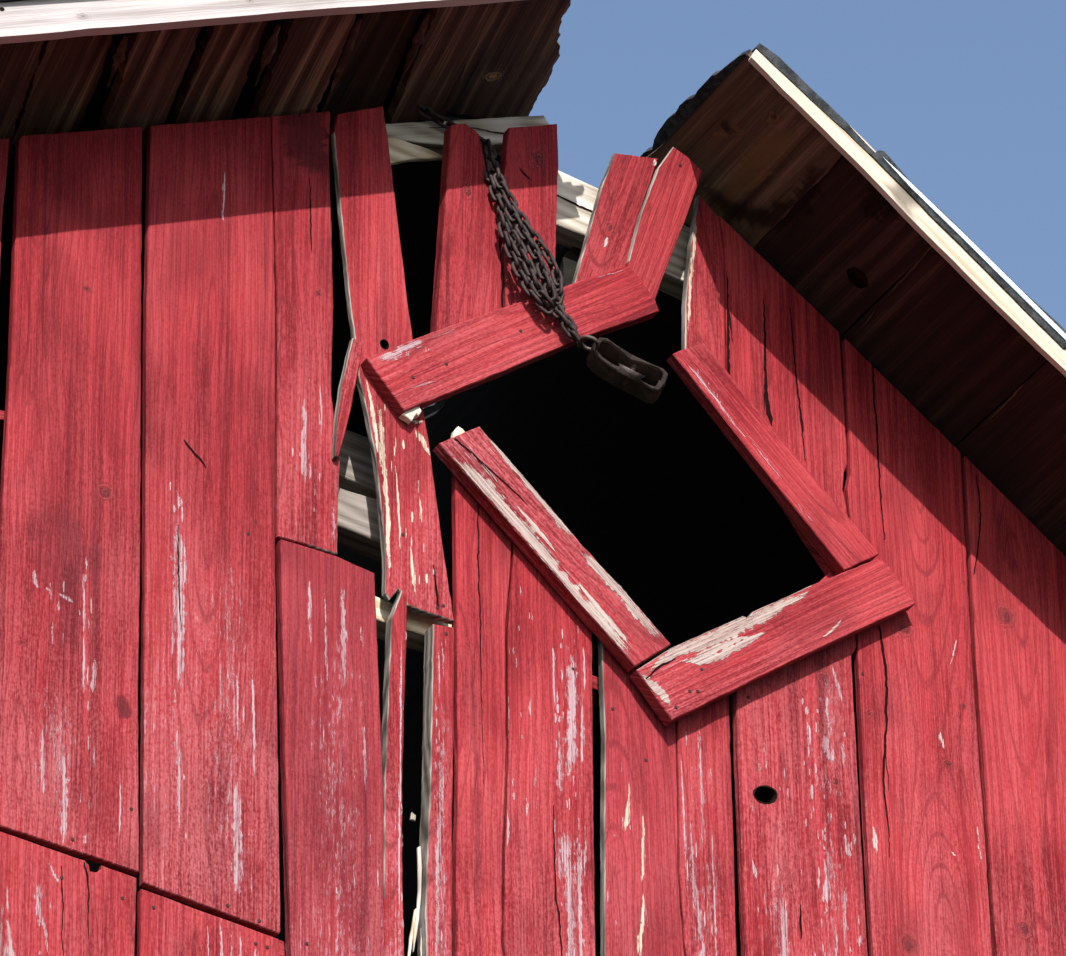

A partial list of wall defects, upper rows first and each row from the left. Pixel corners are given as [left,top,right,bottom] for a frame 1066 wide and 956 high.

crack [725,271,733,375]
crack [763,298,806,461]
peeling [170,482,187,710]
peeling [367,386,434,593]
peeling [455,441,627,652]
peeling [585,555,658,637]
peeling [642,592,807,705]
crack [973,475,981,574]
peeling [552,630,587,956]
peeling [802,669,845,826]
peeling [817,812,856,924]
crack [878,626,890,857]